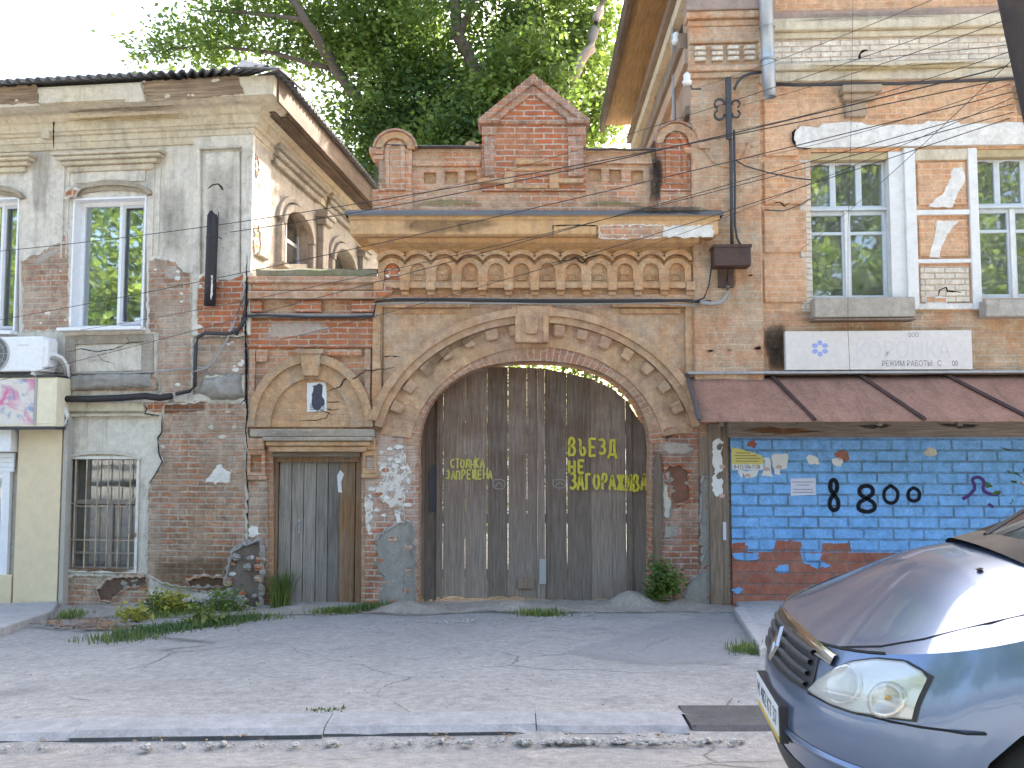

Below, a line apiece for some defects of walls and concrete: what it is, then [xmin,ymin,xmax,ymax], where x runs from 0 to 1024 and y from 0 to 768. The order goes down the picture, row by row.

water stain [634,158,701,214]
spalling [19,233,72,334]
crack [67,338,143,364]
crack [301,323,399,421]
spalling [68,256,267,608]
peeling [364,444,412,535]
spalling [662,462,710,599]
peeling [732,542,759,561]
peeling [773,540,852,574]